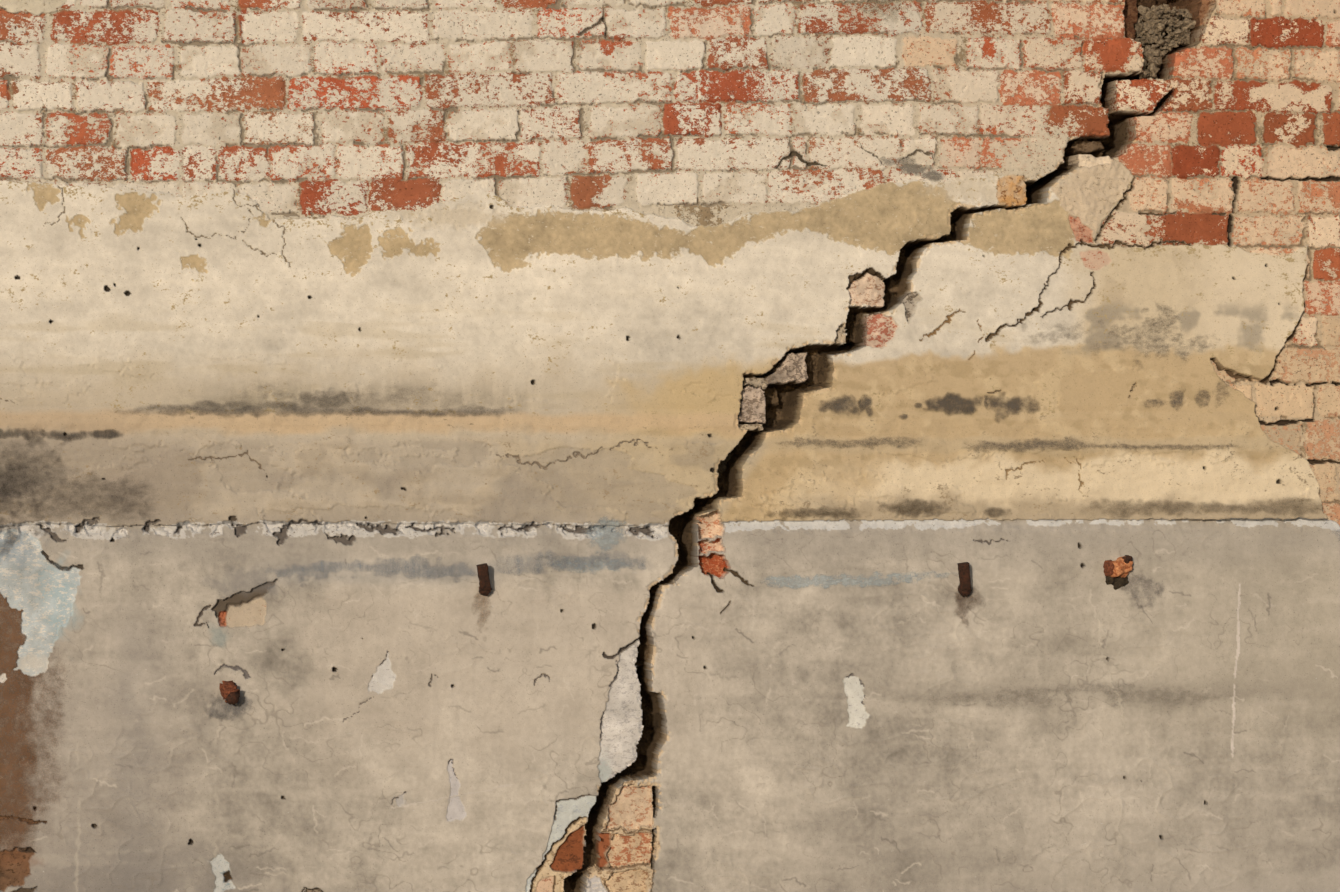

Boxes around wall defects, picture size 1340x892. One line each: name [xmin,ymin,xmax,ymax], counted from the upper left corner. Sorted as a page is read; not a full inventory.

peeling [472,180,1080,276]
peeling [1158,243,1313,394]
crack [496,439,664,470]
crack [564,0,1217,892]
peeling [723,519,1001,534]
peeling [1026,519,1190,527]
peeling [1216,518,1340,531]
spalling [0,518,668,683]
crack [534,674,551,686]
flaking render [526,638,661,892]